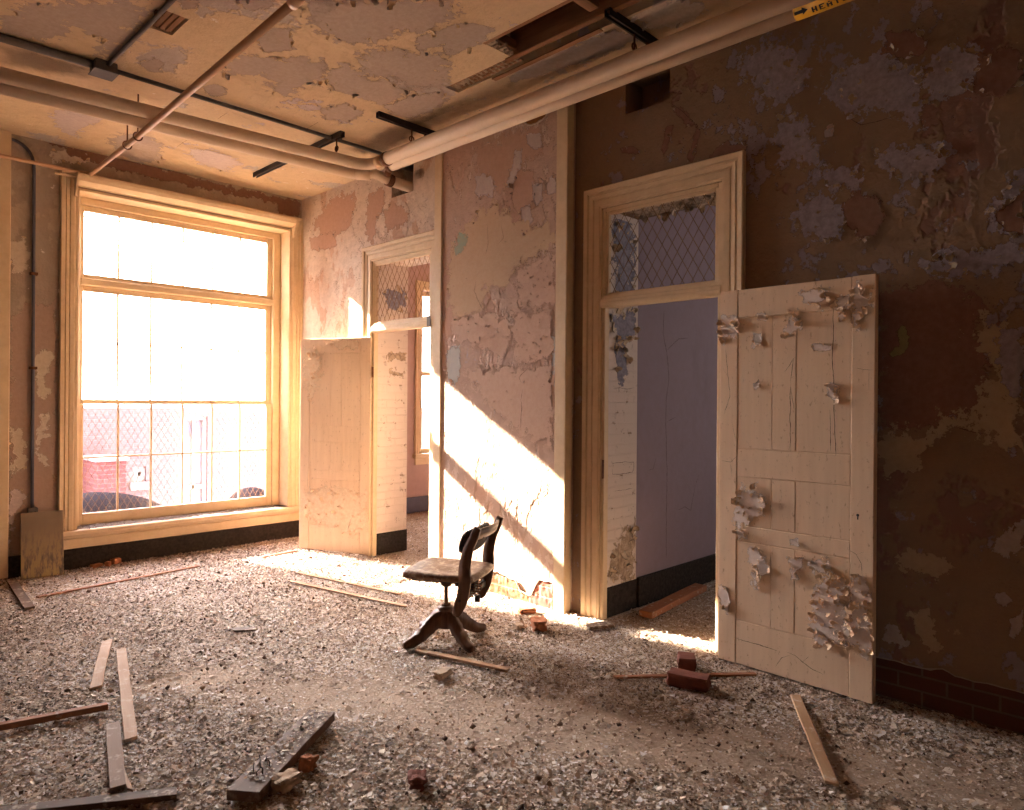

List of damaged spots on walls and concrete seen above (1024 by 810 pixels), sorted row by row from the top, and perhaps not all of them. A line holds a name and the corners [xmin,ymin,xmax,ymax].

peeling [0,0,199,59]
peeling [211,27,451,123]
peeling [300,0,514,59]
peeling [48,110,301,217]
peeling [736,35,993,244]
peeling [309,187,410,252]
peeling [443,148,556,321]
peeling [609,306,641,386]
peeling [8,297,59,555]
peeling [730,482,770,590]
flaking render [479,570,553,610]
flaking render [787,538,1024,736]